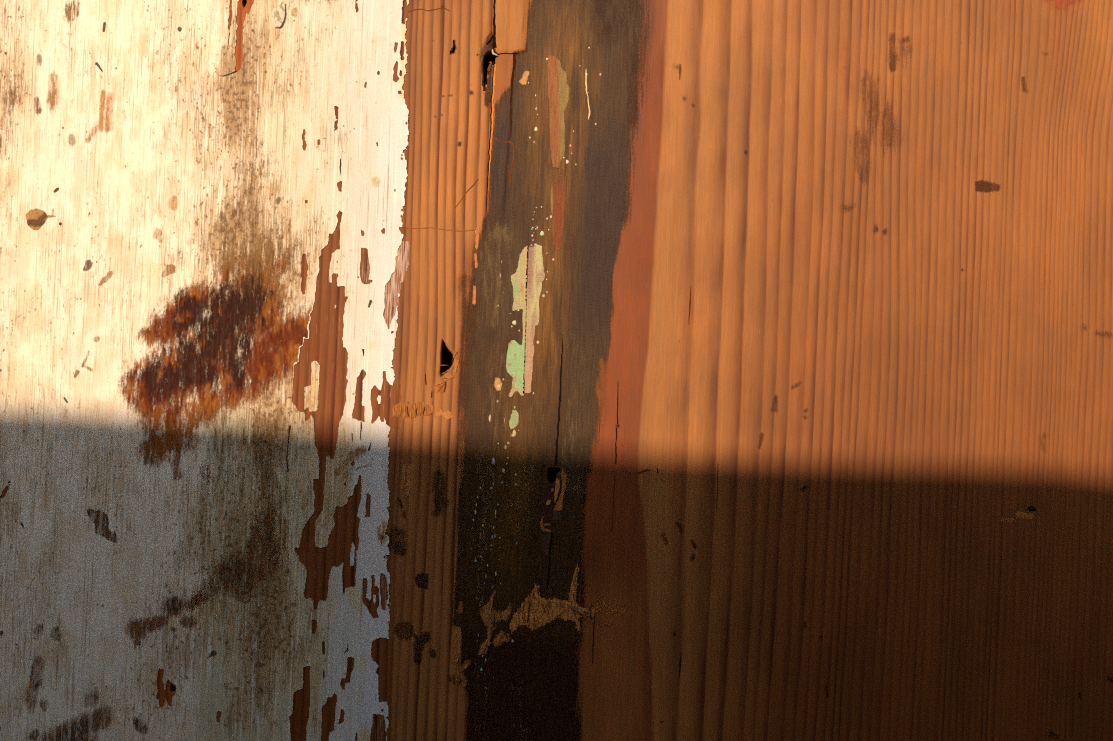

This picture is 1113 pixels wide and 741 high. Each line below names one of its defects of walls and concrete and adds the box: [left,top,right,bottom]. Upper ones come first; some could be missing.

peeling [292,211,459,655]
damp [432,0,649,741]
peeling [289,657,354,741]
peeling [355,635,394,741]
spalling [447,563,596,688]